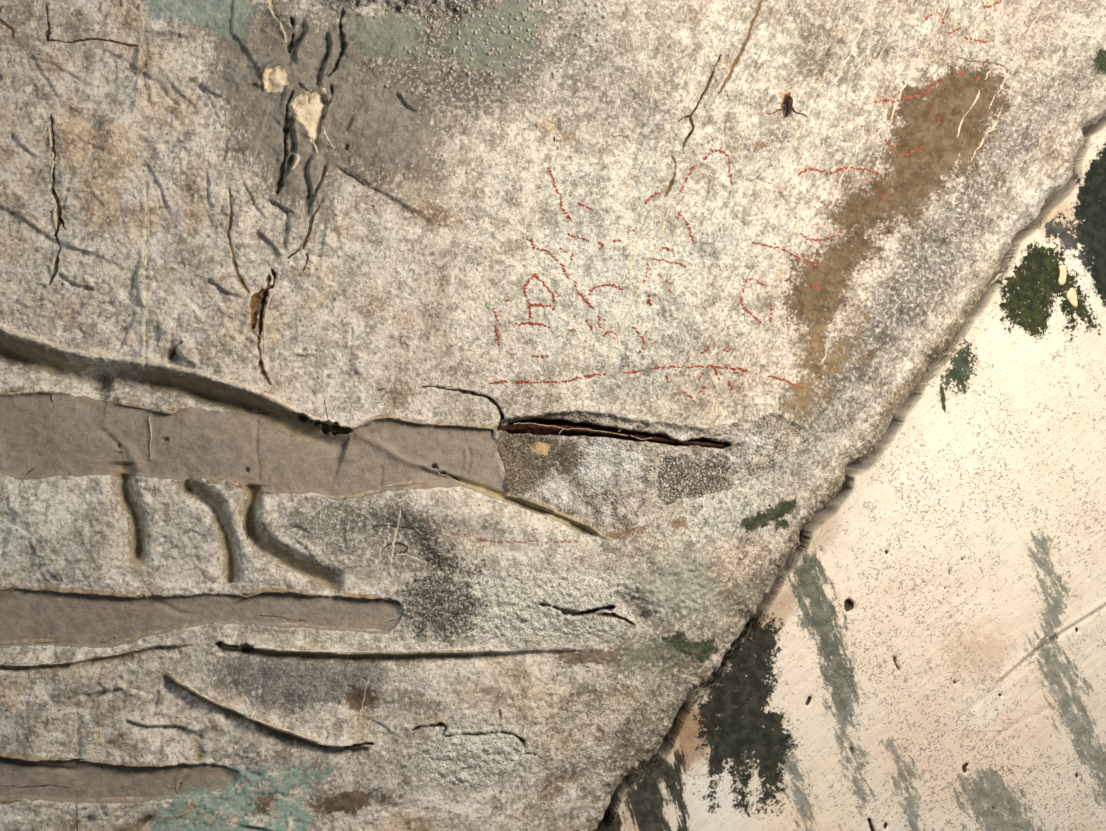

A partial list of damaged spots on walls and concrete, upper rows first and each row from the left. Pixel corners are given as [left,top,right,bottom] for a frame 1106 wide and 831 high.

crack [47,115,67,285]
crack [227,188,325,385]
peeling [196,0,484,221]
crack [664,0,762,198]
leakage [767,59,1018,435]
leakage [1019,143,1106,307]
peeling [0,386,808,540]
peeling [0,751,239,817]
peeling [0,585,403,660]
crack [576,605,634,625]
leakage [595,607,815,831]
leakage [779,546,876,814]